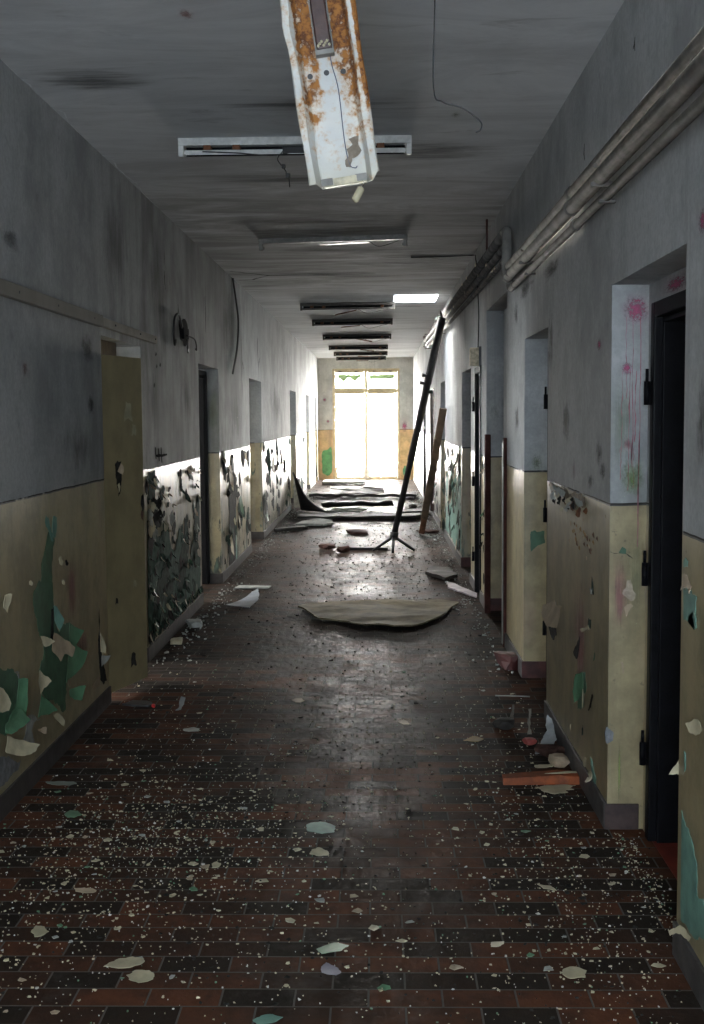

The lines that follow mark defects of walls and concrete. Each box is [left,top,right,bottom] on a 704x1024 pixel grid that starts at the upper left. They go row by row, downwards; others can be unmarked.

peeling [0,516,88,756]
peeling [141,466,203,645]
peeling [221,449,251,566]
peeling [262,435,307,524]
peeling [432,444,461,552]
peeling [549,482,587,517]
peeling [680,557,697,630]
peeling [669,751,686,775]
peeling [685,719,702,736]
peeling [668,810,704,941]